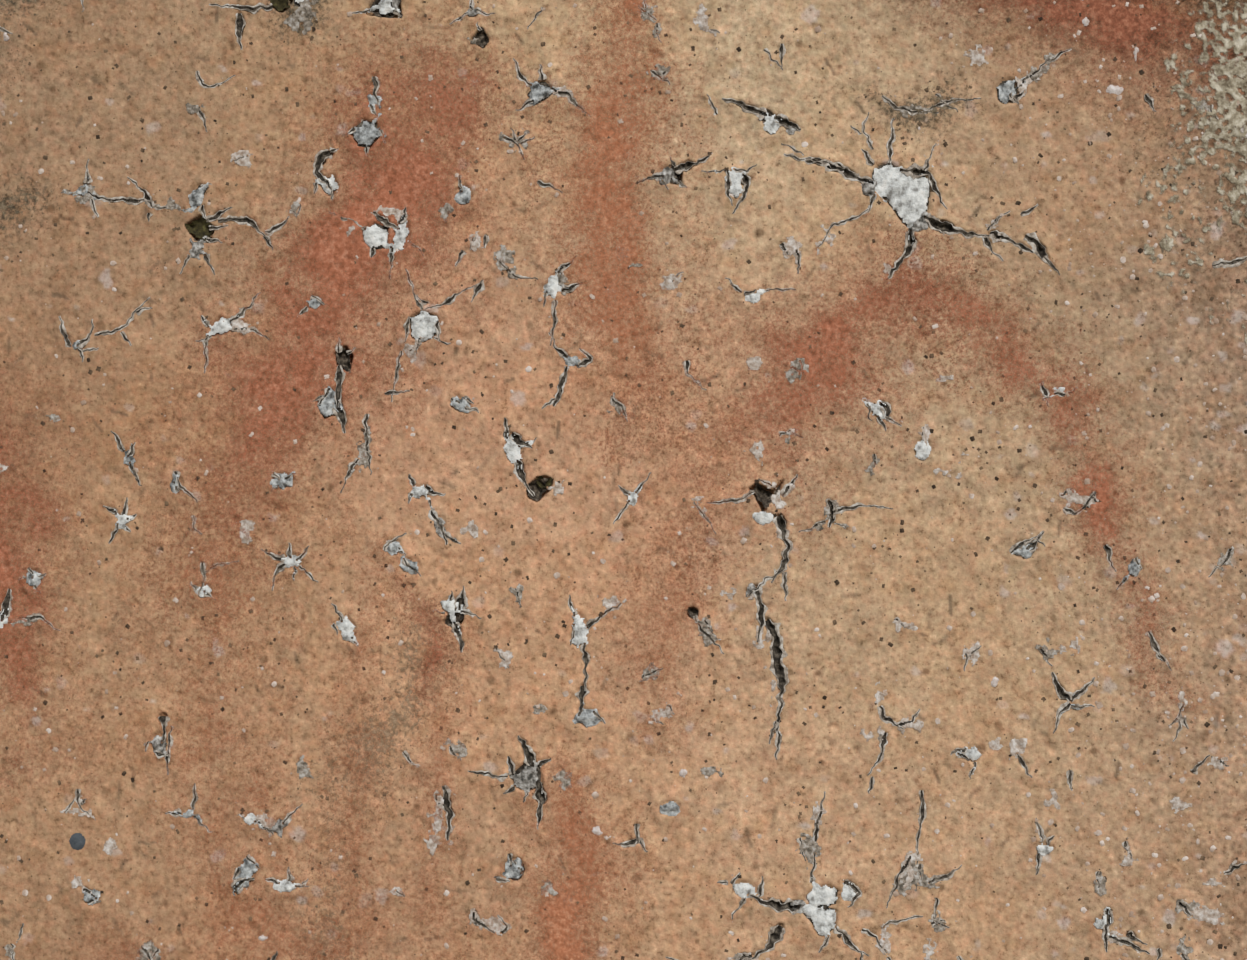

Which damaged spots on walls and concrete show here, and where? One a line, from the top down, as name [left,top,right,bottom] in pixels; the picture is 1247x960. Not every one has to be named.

damp [868,78,986,141]
damp [942,0,1247,293]
crack [313,336,372,494]
crack [503,417,537,497]
crack [613,472,652,524]
damp [681,260,1164,685]
crack [691,474,893,760]
crack [726,925,786,960]
crack [860,898,964,960]